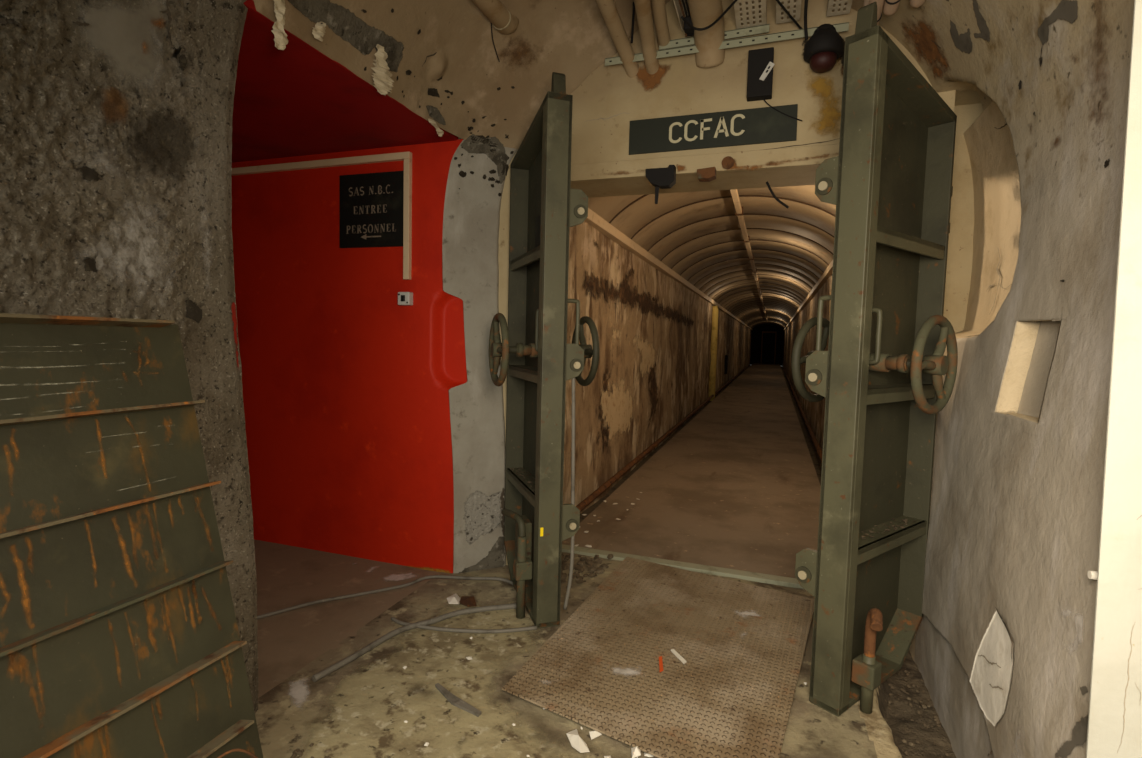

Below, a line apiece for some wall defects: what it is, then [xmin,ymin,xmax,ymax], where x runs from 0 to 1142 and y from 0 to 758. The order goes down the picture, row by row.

spalling [271,0,415,98]
rust [637,65,669,90]
water stain [811,77,841,131]
peeling [950,0,990,54]
peeling [1038,0,1078,70]
water stain [597,369,610,452]
water stain [648,363,658,423]
crack [1117,624,1141,753]
peeling [1055,713,1089,758]